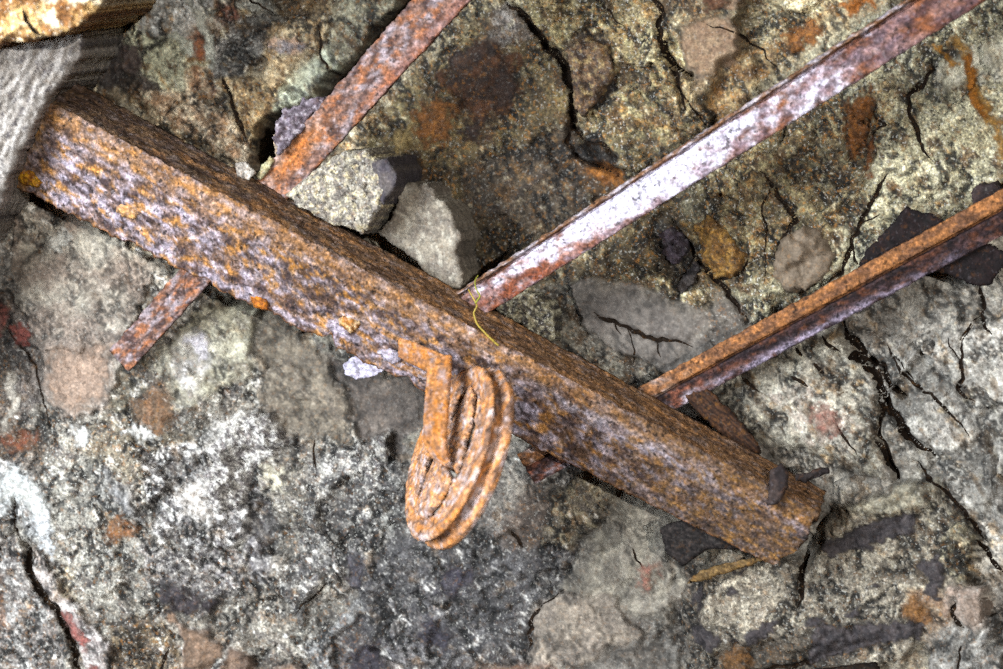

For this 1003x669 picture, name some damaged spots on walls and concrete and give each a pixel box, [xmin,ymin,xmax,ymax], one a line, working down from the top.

corrosion [780,18,823,52]
corrosion [839,0,876,17]
corrosion [272,96,327,155]
corrosion [386,96,458,154]
crack [505,2,619,176]
corrosion [842,85,875,179]
corrosion [933,34,1003,160]
corrosion [587,162,625,187]
corrosion [343,356,384,380]
crack [791,286,1003,572]
crack [0,498,81,669]
crack [950,602,984,669]